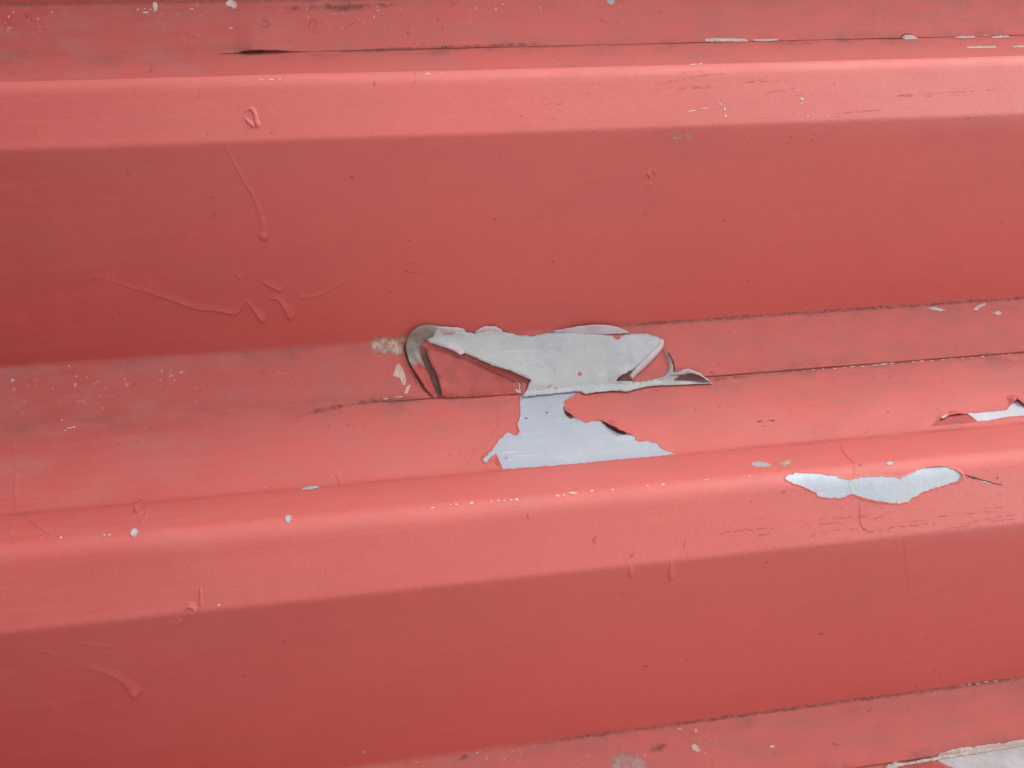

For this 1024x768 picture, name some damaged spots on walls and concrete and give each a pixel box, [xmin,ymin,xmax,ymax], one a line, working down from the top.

peeling [384,325,712,471]
peeling [930,394,1024,427]
peeling [783,461,965,506]